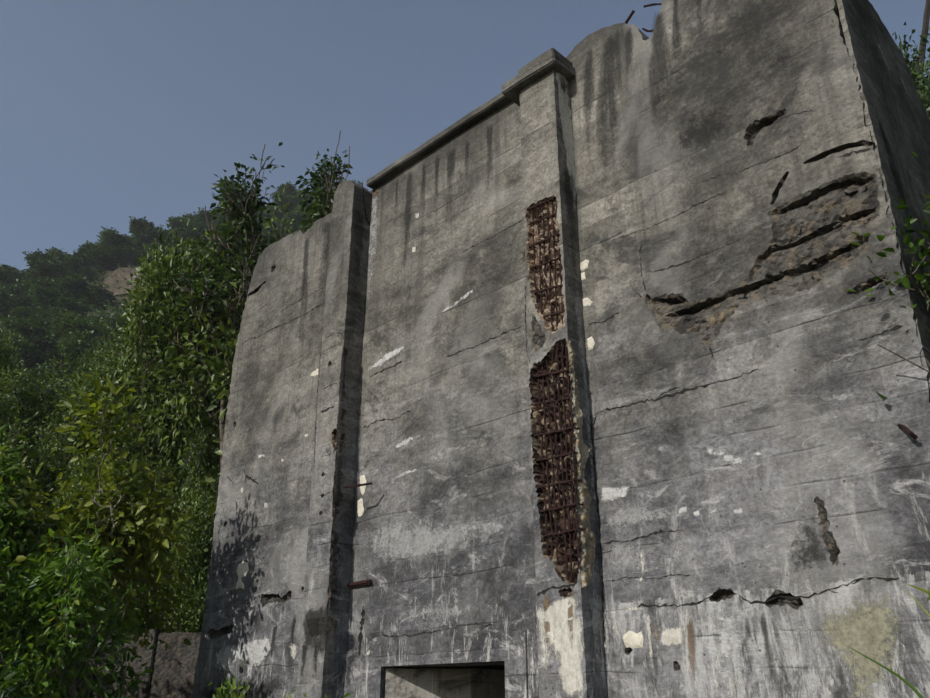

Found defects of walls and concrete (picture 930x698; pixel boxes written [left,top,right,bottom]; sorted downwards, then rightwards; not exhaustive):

damp [651,0,679,90]
damp [679,111,724,147]
damp [395,151,454,258]
crack [612,140,875,241]
spalling [635,171,880,357]
spalling [852,272,889,295]
spalling [522,194,596,591]
crack [590,369,757,650]
spalling [260,587,304,608]
crack [537,584,575,596]
crack [738,577,900,604]